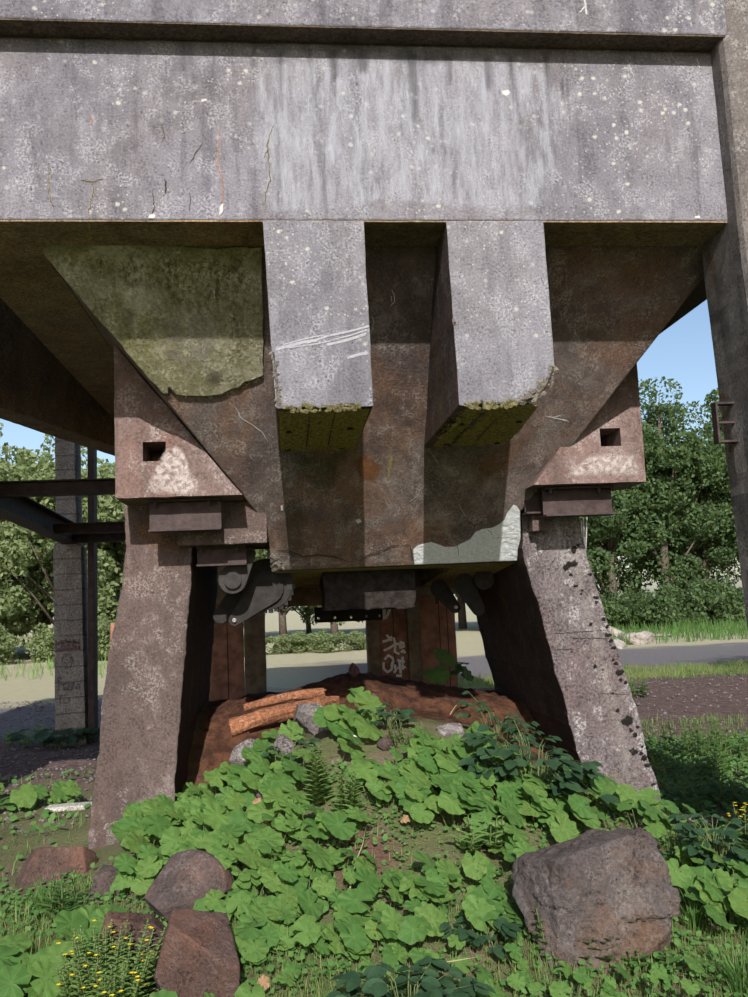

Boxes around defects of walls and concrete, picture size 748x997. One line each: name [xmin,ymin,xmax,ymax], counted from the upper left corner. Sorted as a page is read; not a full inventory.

crack [47,165,55,209]
crack [190,130,224,242]
crack [264,125,274,208]